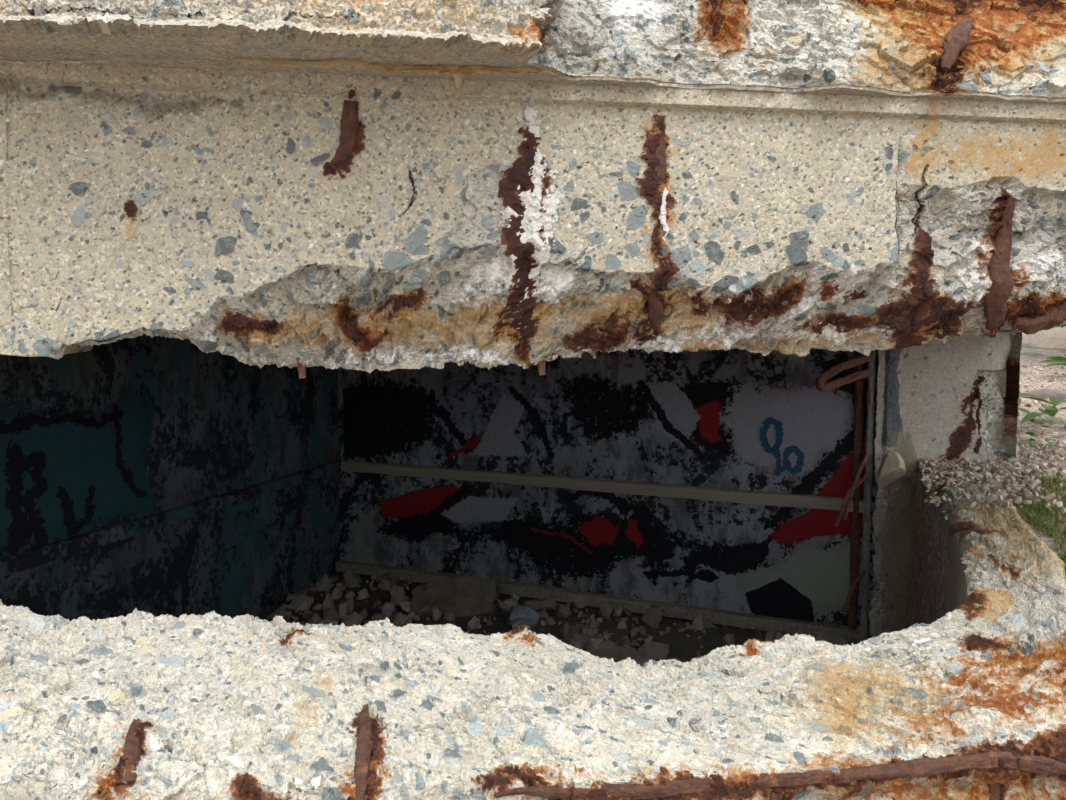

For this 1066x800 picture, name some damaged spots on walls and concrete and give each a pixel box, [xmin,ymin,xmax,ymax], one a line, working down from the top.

rust [694,0,751,56]
spalling [527,0,1066,98]
spalling [323,85,366,179]
spalling [48,141,1066,392]
rust [492,106,973,369]
rust [216,309,282,350]
rust [331,287,433,354]
spalling [970,370,1019,460]
rust [966,549,1037,589]
rust [794,586,1066,754]